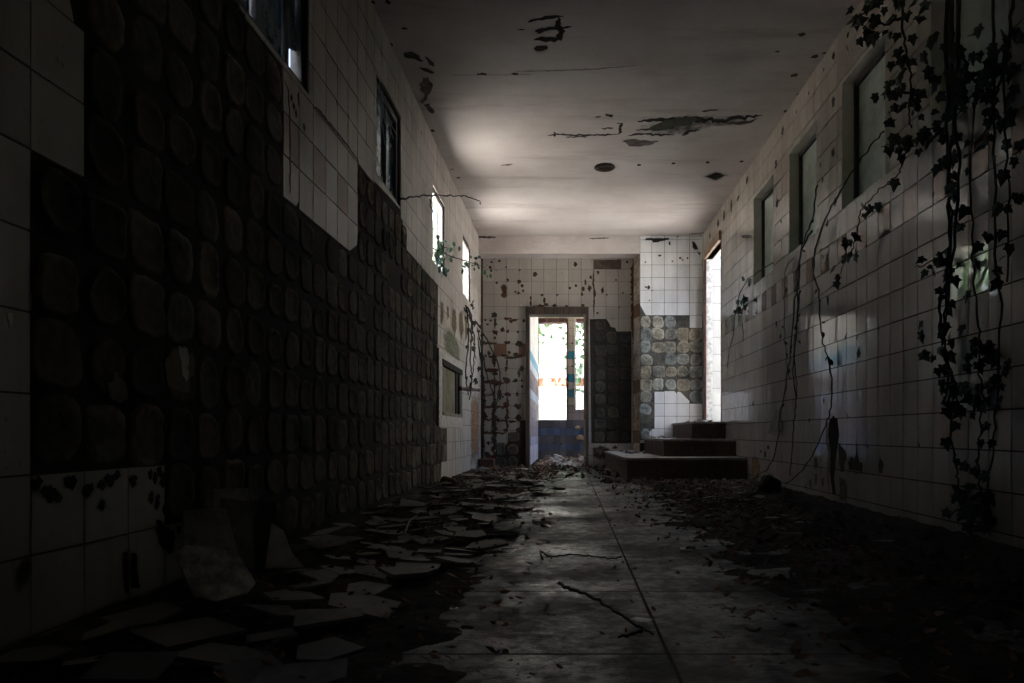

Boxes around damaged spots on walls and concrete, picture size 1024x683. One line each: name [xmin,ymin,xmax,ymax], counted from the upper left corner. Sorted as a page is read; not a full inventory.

peeling [519,15,572,51]
crack [548,109,762,138]
spalling [484,260,568,307]
peeling [478,312,526,467]
peeling [590,285,702,456]